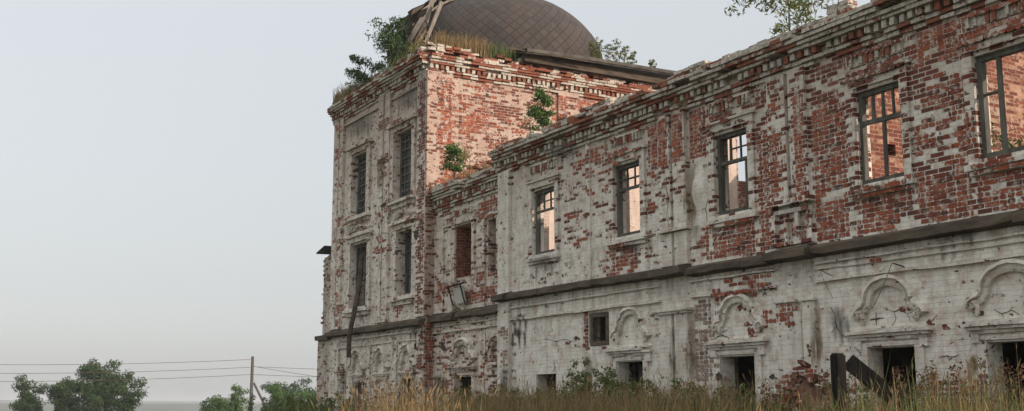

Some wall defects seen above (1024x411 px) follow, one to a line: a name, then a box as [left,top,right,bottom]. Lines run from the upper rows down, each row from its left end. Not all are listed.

peeling [534,95,598,124]
peeling [547,0,1024,260]
peeling [606,242,641,277]
spalling [574,311,607,350]
peeling [683,268,798,386]
peeling [769,368,829,389]